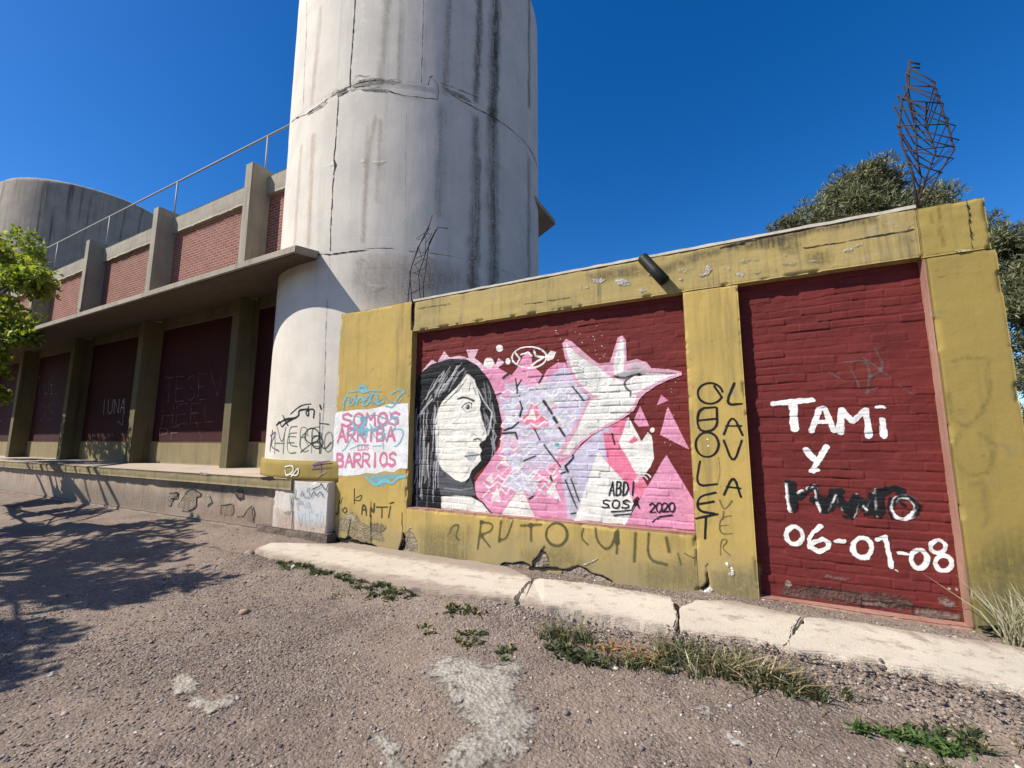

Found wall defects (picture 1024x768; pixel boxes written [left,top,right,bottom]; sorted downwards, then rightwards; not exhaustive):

crack [291,1,538,266]
leakage [474,0,498,285]
peeling [584,277,646,293]
peeling [221,504,254,522]
spalling [334,512,386,543]
crack [501,546,613,582]